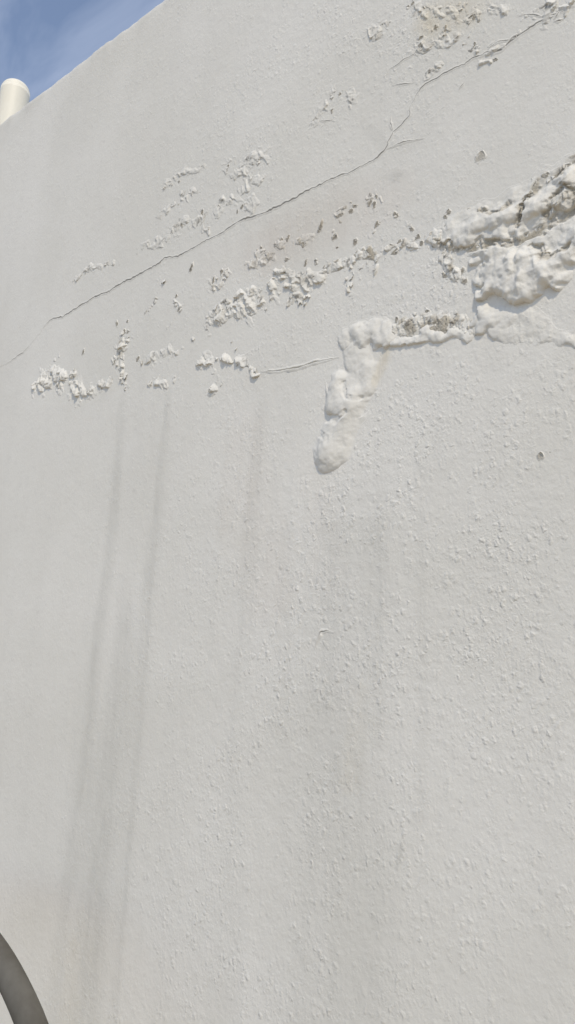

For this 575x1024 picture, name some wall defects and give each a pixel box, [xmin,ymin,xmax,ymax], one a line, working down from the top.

peeling [406,0,575,81]
peeling [136,143,271,255]
crack [0,6,575,367]
peeling [29,193,477,408]
crack [261,357,339,374]